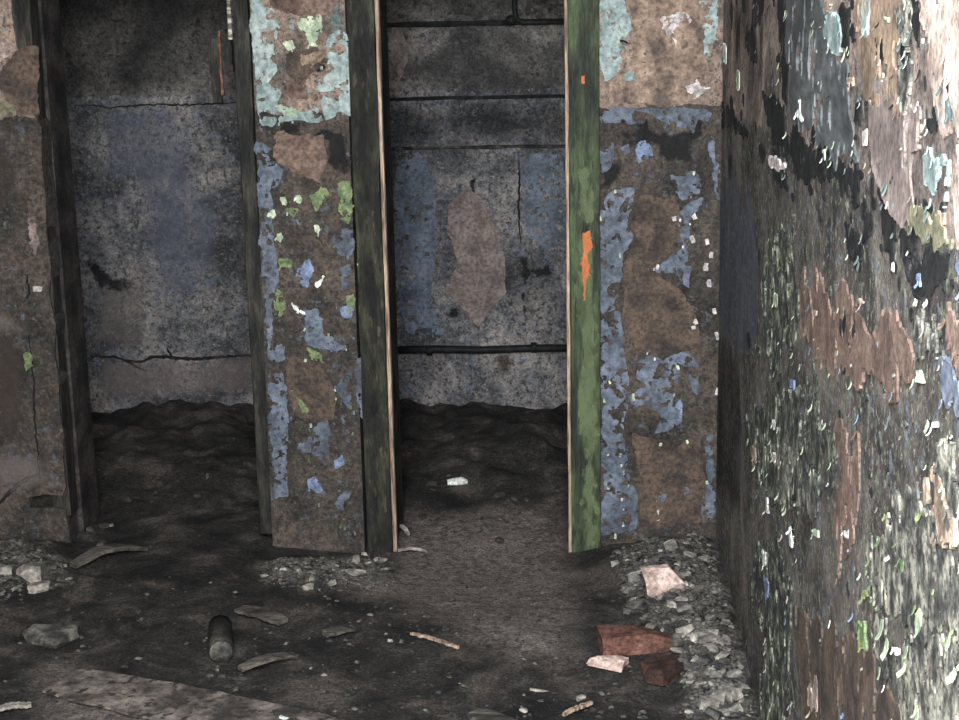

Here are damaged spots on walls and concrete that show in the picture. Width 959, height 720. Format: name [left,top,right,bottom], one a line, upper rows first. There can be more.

peeling [525,0,564,19]
spalling [0,38,40,120]
peeling [249,0,362,510]
corrosion [580,230,593,301]
crack [90,348,251,371]